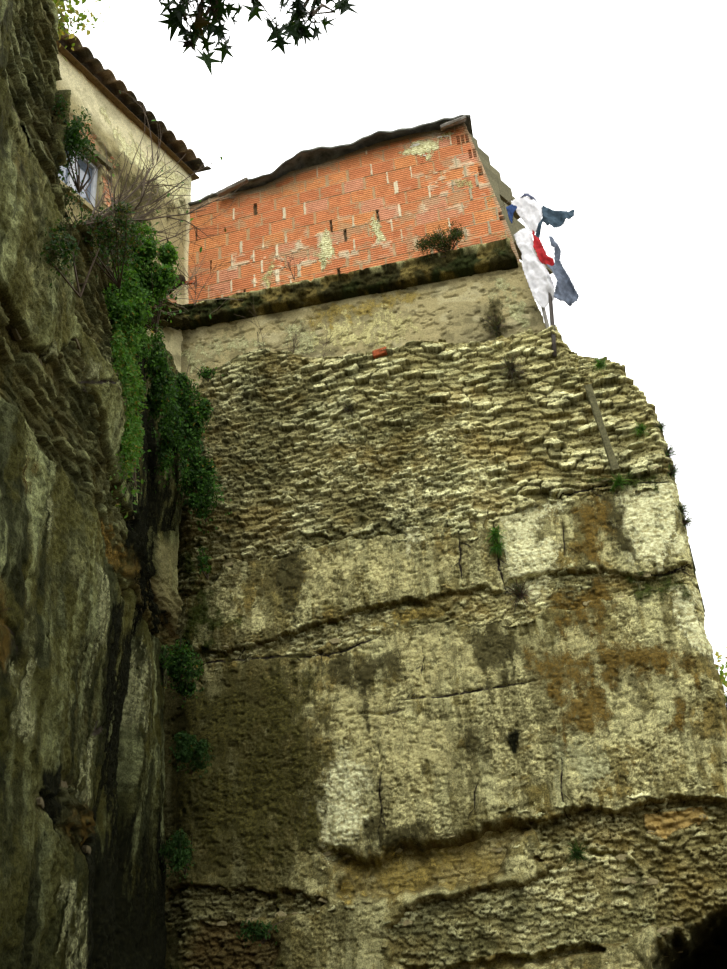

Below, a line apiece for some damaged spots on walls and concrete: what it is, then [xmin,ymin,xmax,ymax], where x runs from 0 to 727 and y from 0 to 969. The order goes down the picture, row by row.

crack [454,522,513,596]
crack [640,564,691,578]
leakage [56,315,522,969]
leakage [4,660,37,743]
crack [358,648,535,718]
leakage [39,765,64,839]
crack [378,750,386,840]
crack [560,747,575,823]